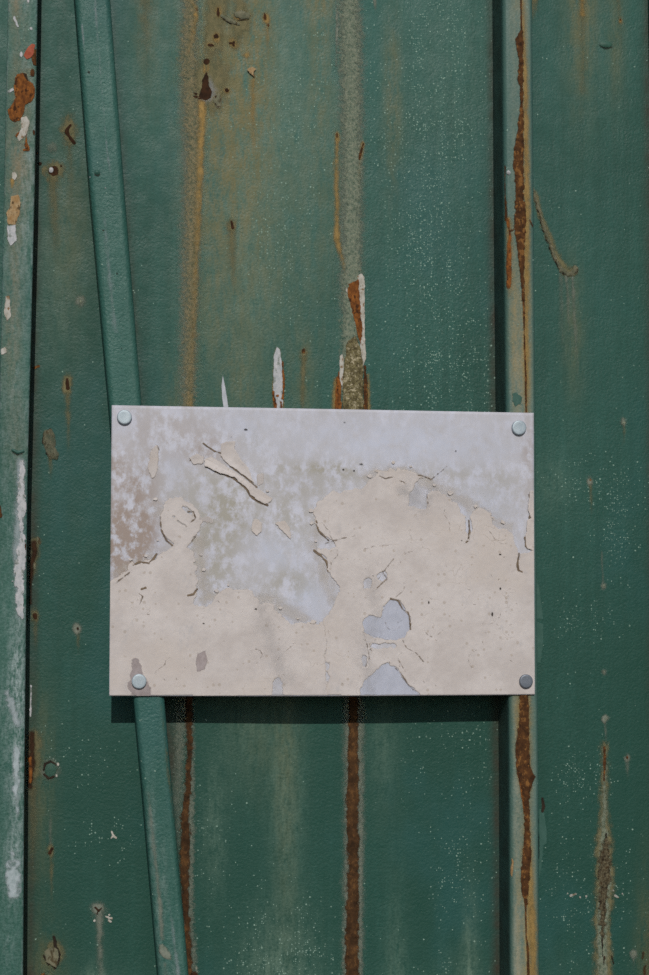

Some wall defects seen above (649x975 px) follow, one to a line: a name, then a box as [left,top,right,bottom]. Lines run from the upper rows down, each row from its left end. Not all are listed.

corrosion [8,68,35,151]
corrosion [181,0,256,407]
peeling [189,441,272,506]
peeling [110,461,535,696]
peeling [333,274,370,410]
corrosion [504,0,537,413]
corrosion [179,696,198,975]
corrosion [343,696,363,975]
corrosion [510,695,536,975]
corrosion [594,743,614,975]